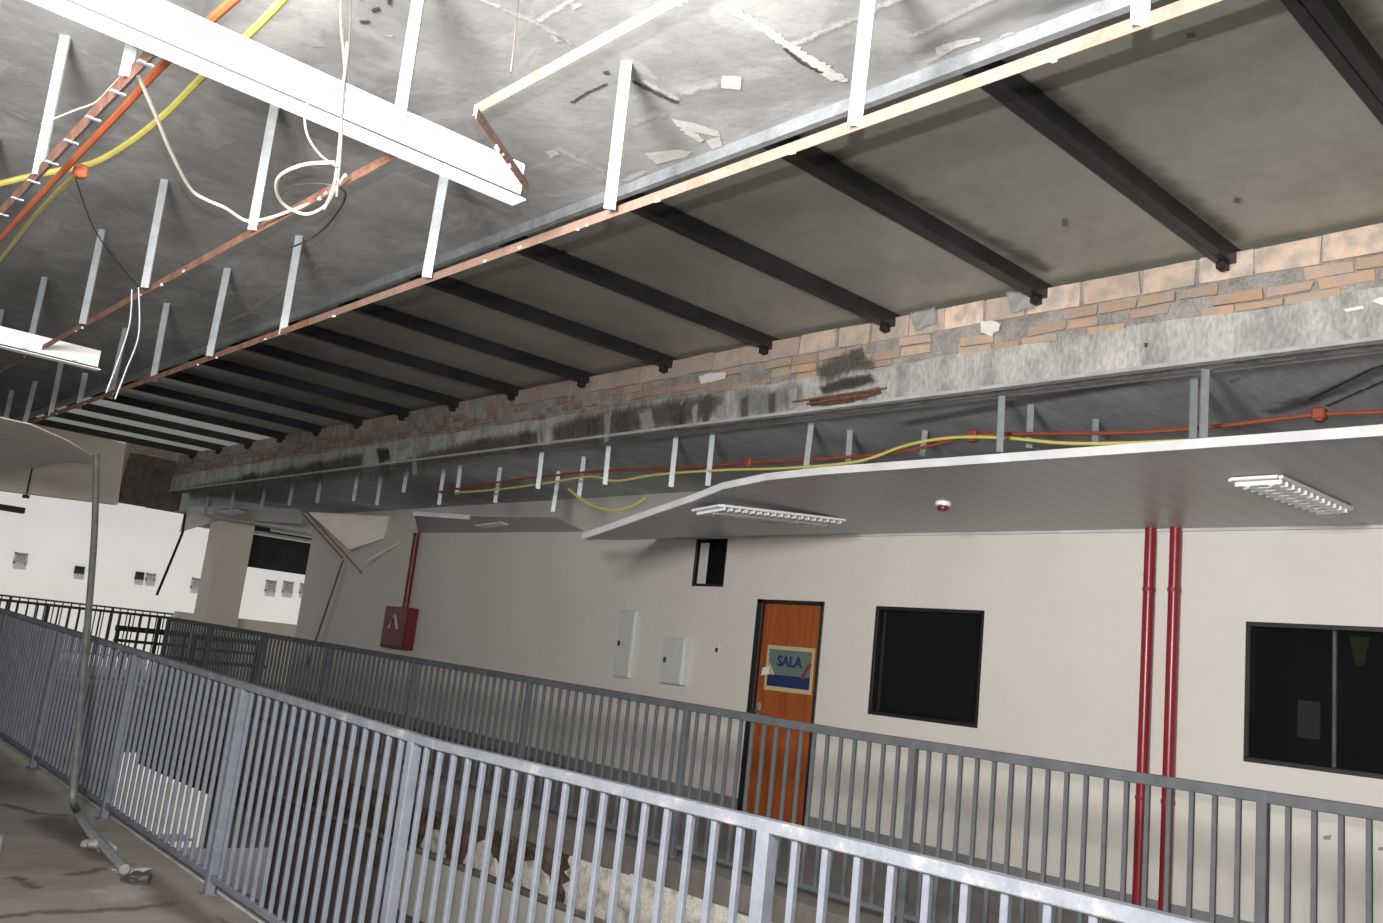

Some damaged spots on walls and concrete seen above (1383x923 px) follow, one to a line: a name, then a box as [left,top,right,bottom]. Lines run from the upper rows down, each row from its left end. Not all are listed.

crack [729,4,883,82]
flaking render [621,112,722,182]
damp [817,347,874,379]